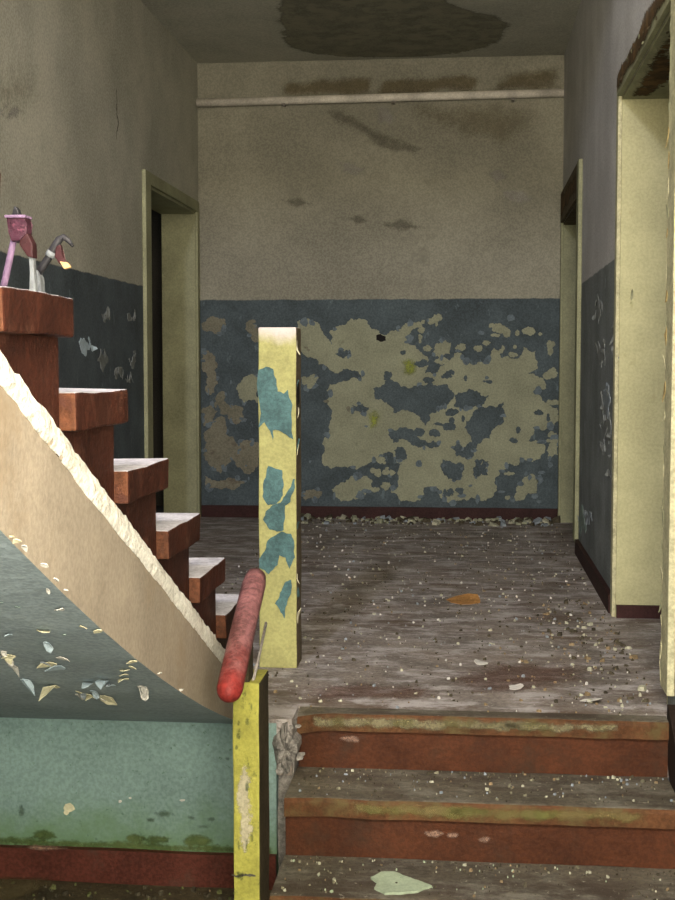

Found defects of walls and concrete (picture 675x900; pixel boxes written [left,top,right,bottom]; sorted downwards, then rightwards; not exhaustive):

water stain [285,79,369,94]
water stain [382,76,476,94]
water stain [499,71,555,90]
peeling [201,316,226,336]
peeling [245,319,260,343]
peeling [79,336,136,383]
peeling [200,348,259,492]
peeling [297,314,559,506]
water stain [390,719,419,728]
water stain [485,722,548,730]
spalling [272,721,305,775]
water stain [0,830,234,852]